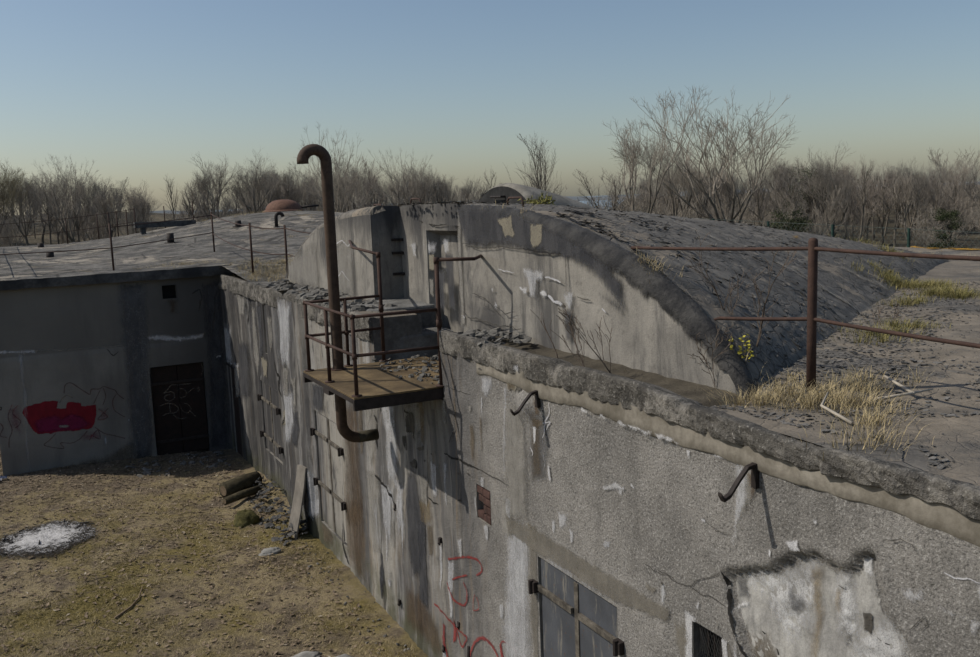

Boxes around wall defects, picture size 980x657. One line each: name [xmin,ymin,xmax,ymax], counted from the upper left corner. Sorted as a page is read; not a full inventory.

leakage [428,240,464,317]
peeling [399,201,549,237]
leakage [499,269,572,340]
peeling [530,224,543,247]
leakage [457,207,622,313]
peeling [556,205,980,447]
leakage [303,473,319,517]
leakage [366,404,462,616]
peeling [506,516,669,620]
crack [644,563,747,657]
peeling [736,558,908,657]